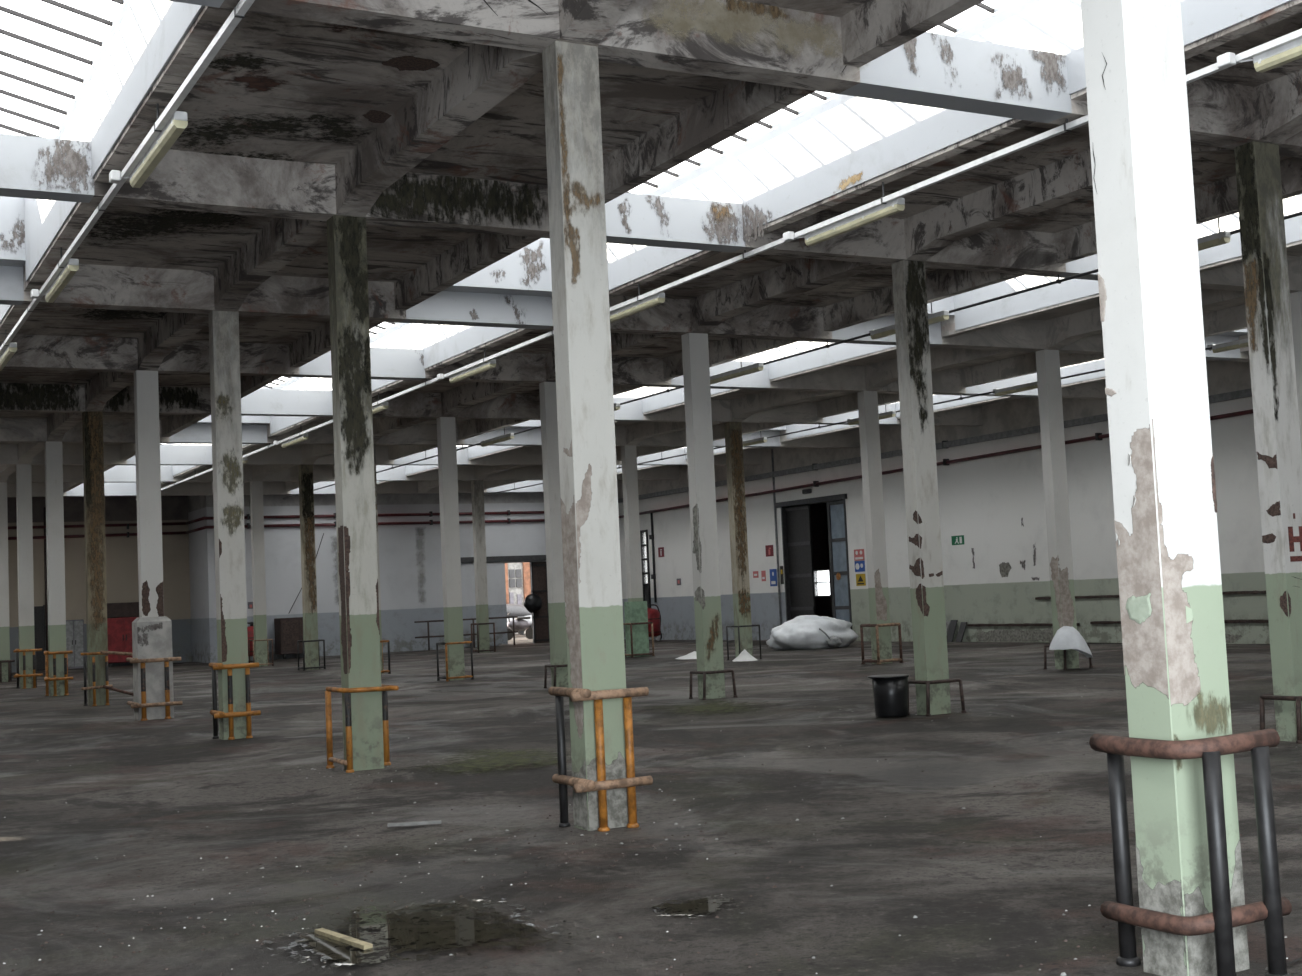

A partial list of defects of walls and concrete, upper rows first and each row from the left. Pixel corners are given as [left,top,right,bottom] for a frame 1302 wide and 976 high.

peeling [0,220,25,251]
leakage [1235,142,1279,421]
leakage [334,173,545,528]
peeling [560,464,592,739]
peeling [909,510,943,617]
peeling [977,557,1074,642]
peeling [1114,419,1201,706]
peeling [1257,452,1278,470]
peeling [1262,533,1276,544]
peeling [1266,501,1281,517]